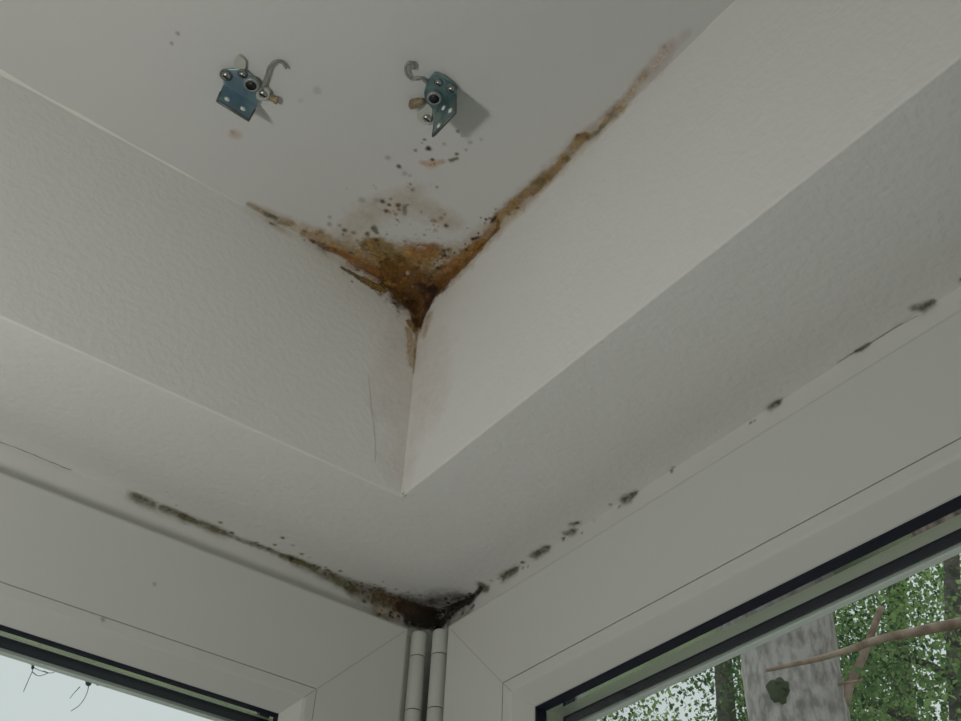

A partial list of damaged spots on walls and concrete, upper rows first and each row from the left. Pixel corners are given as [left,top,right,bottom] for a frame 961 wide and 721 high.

damp [132,493,489,630]
damp [501,546,550,580]